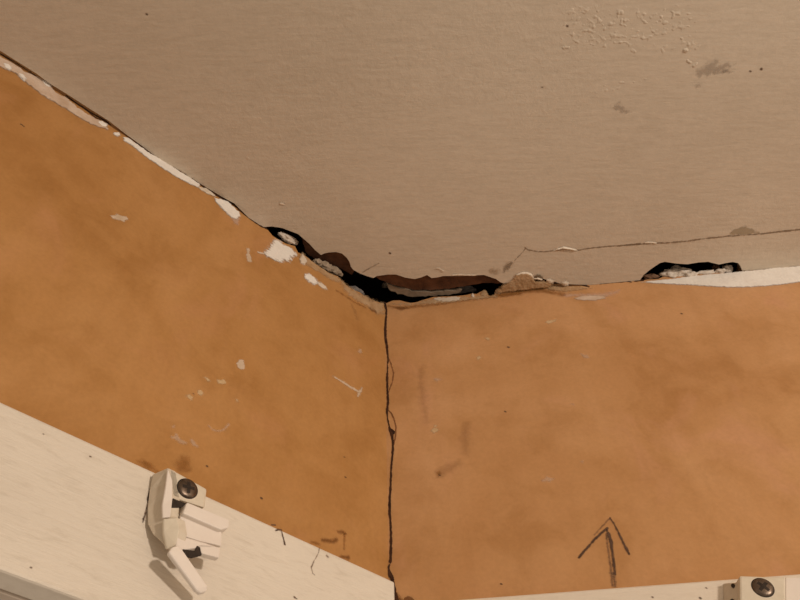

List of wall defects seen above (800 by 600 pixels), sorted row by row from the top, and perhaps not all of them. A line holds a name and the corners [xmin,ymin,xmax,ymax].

spalling [267,227,588,313]
crack [504,227,800,272]
spalling [641,262,737,280]
crack [384,302,399,600]